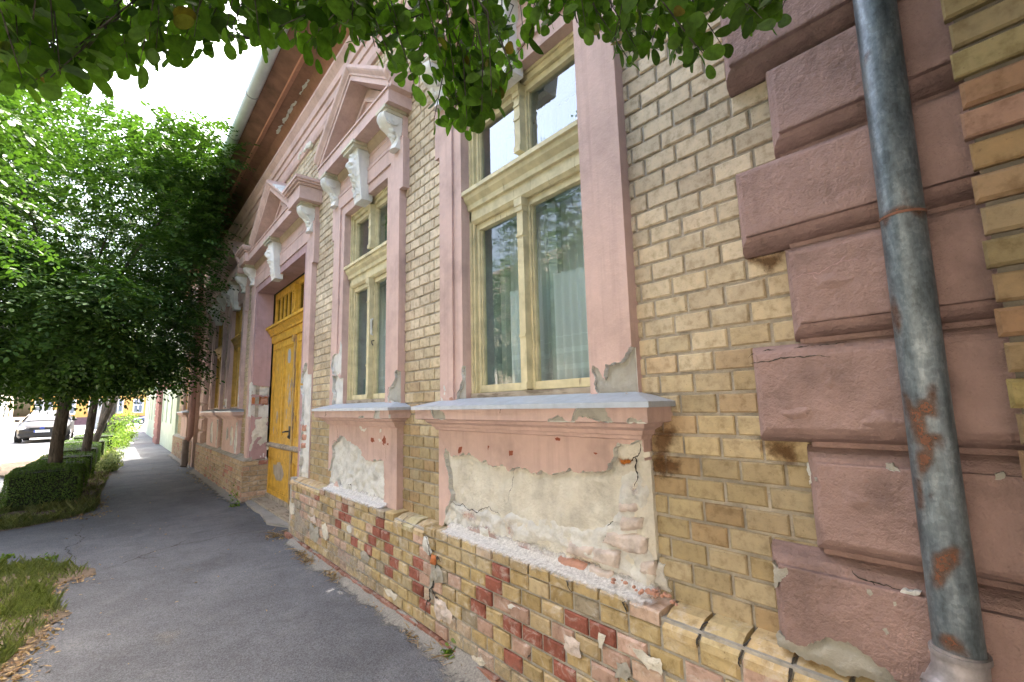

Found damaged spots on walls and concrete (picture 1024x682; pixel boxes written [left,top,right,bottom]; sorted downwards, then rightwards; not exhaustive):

damp [749,253,780,269]
flaking render [225,349,312,481]
crack [631,444,641,486]
damp [654,428,679,473]
damp [765,442,795,463]
rust [907,386,941,507]
flaking render [444,440,672,592]
rust [933,548,959,587]
crack [696,621,708,648]
crack [738,638,751,667]
flaking render [776,630,898,682]
rust [940,634,963,653]